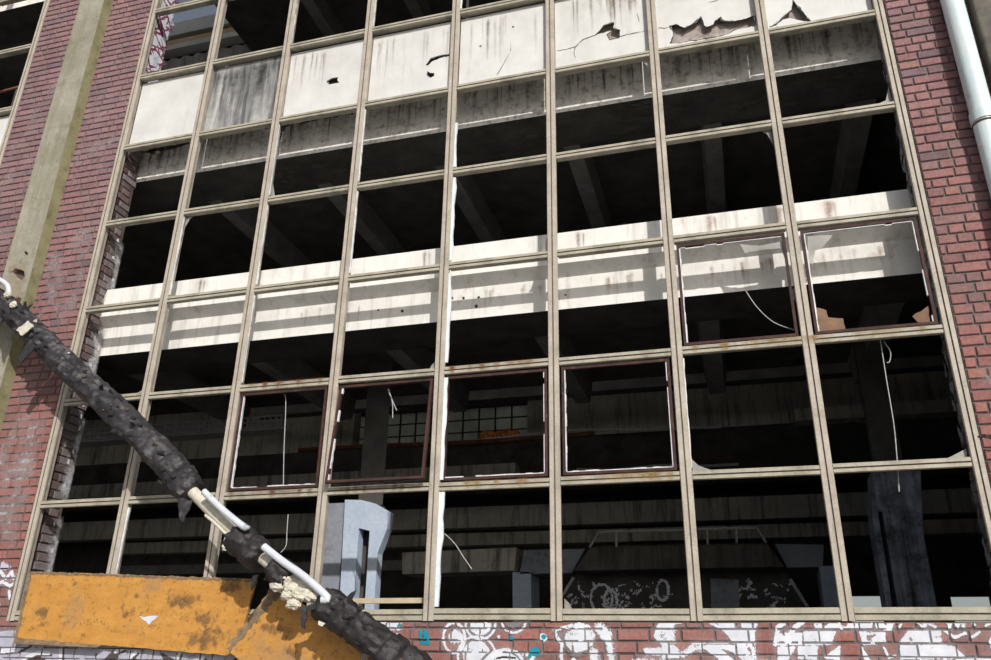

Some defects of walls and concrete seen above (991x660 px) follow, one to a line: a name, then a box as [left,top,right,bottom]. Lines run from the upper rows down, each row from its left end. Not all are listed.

spalling [770,0,811,27]
spalling [669,15,758,43]